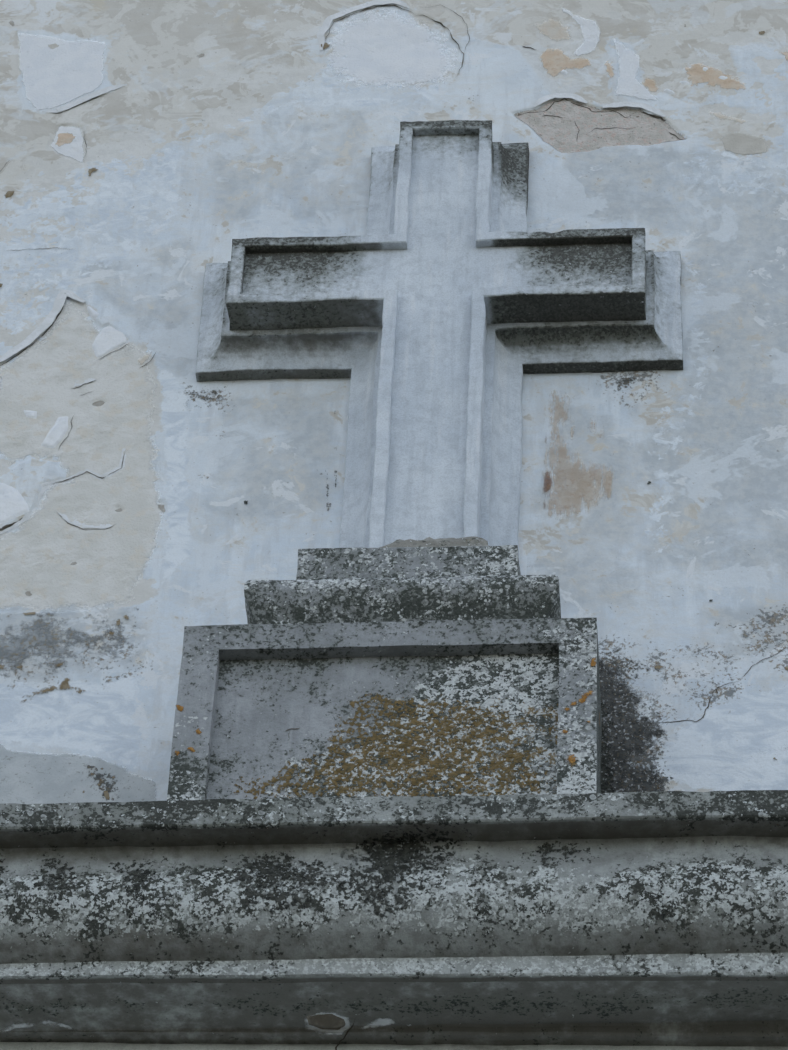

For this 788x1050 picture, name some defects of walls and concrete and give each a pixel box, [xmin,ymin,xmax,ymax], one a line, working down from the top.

flaking render [515,93,684,153]
peeling [0,448,126,534]
water stain [599,647,673,793]
crack [657,649,783,723]
water stain [34,854,79,909]
water stain [108,849,183,922]
water stain [209,823,467,925]
water stain [468,851,499,921]
water stain [536,842,594,866]
water stain [640,860,676,945]
water stain [365,1018,394,1027]